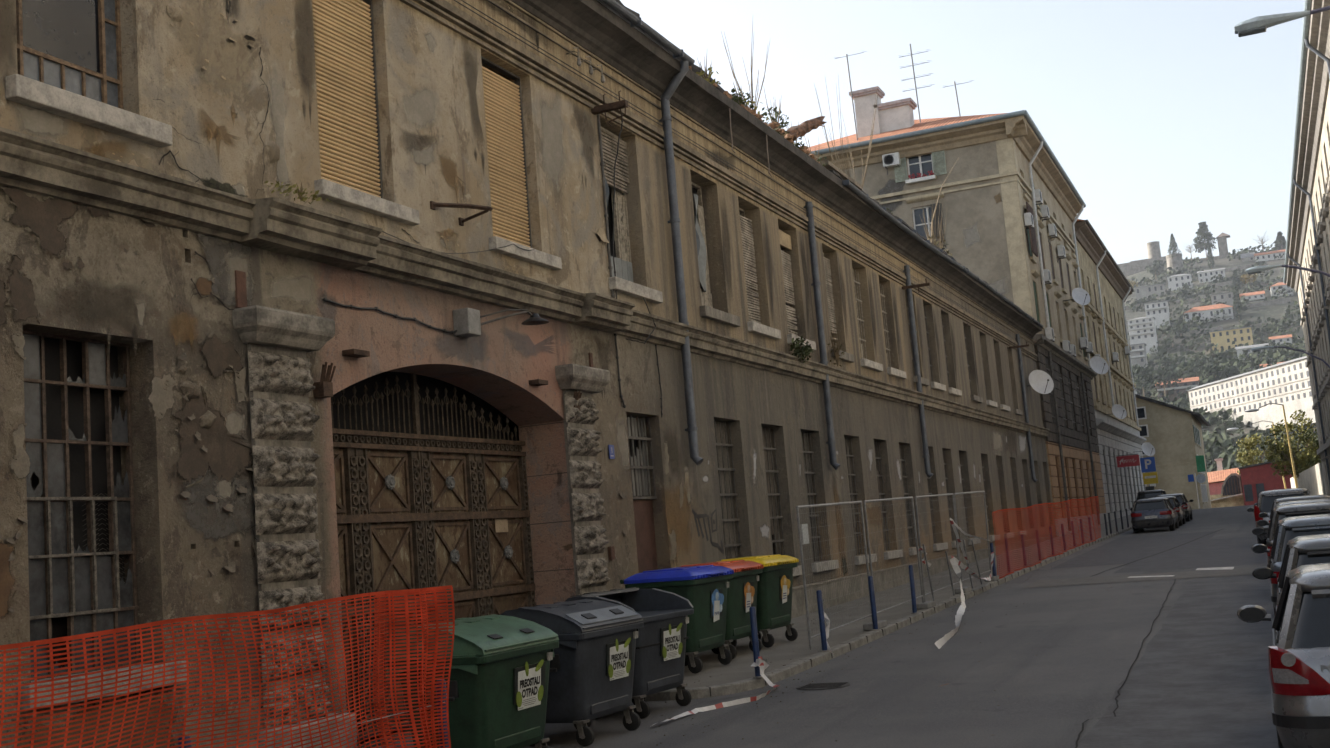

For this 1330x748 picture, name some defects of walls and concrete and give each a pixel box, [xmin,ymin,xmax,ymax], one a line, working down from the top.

damp [226,0,237,18]
crack [153,99,223,191]
crack [255,47,270,195]
peeling [234,366,248,403]
peeling [10,423,30,479]
spalling [148,373,253,513]